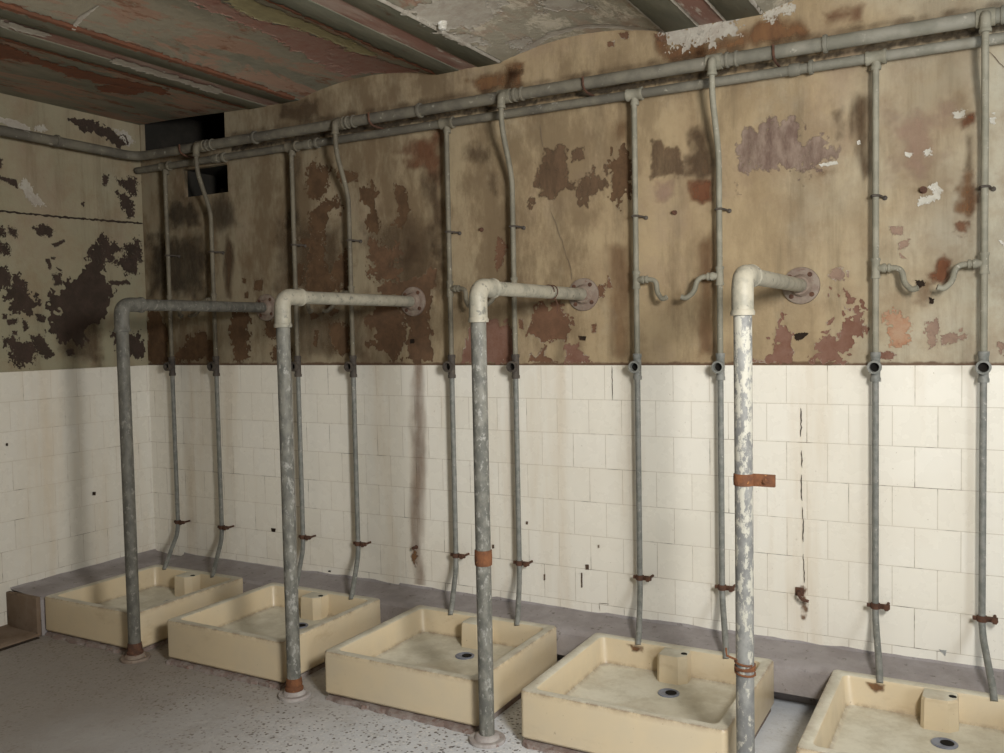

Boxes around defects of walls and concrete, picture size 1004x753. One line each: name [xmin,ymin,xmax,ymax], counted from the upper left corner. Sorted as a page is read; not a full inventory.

flaking render [626,0,745,54]
flaking render [749,0,796,25]
peeling [735,115,840,180]
peeling [527,143,632,212]
damp [169,203,198,227]
peeling [0,223,143,369]
damp [151,239,207,298]
damp [225,239,233,294]
peeling [297,157,437,365]
peeling [752,266,870,365]
peeling [880,307,968,361]